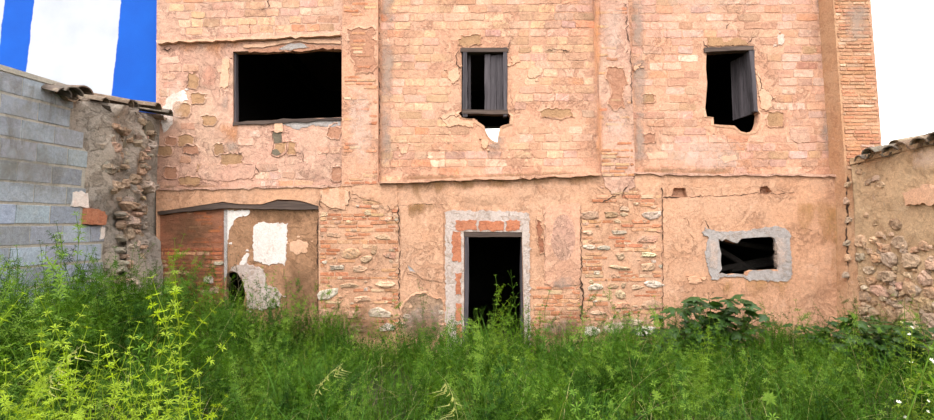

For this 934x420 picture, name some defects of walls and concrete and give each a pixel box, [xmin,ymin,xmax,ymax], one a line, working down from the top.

crack [625,6,633,103]
flaking render [440,111,514,151]
peeling [227,210,250,245]
peeling [230,222,313,312]
crack [842,176,853,289]